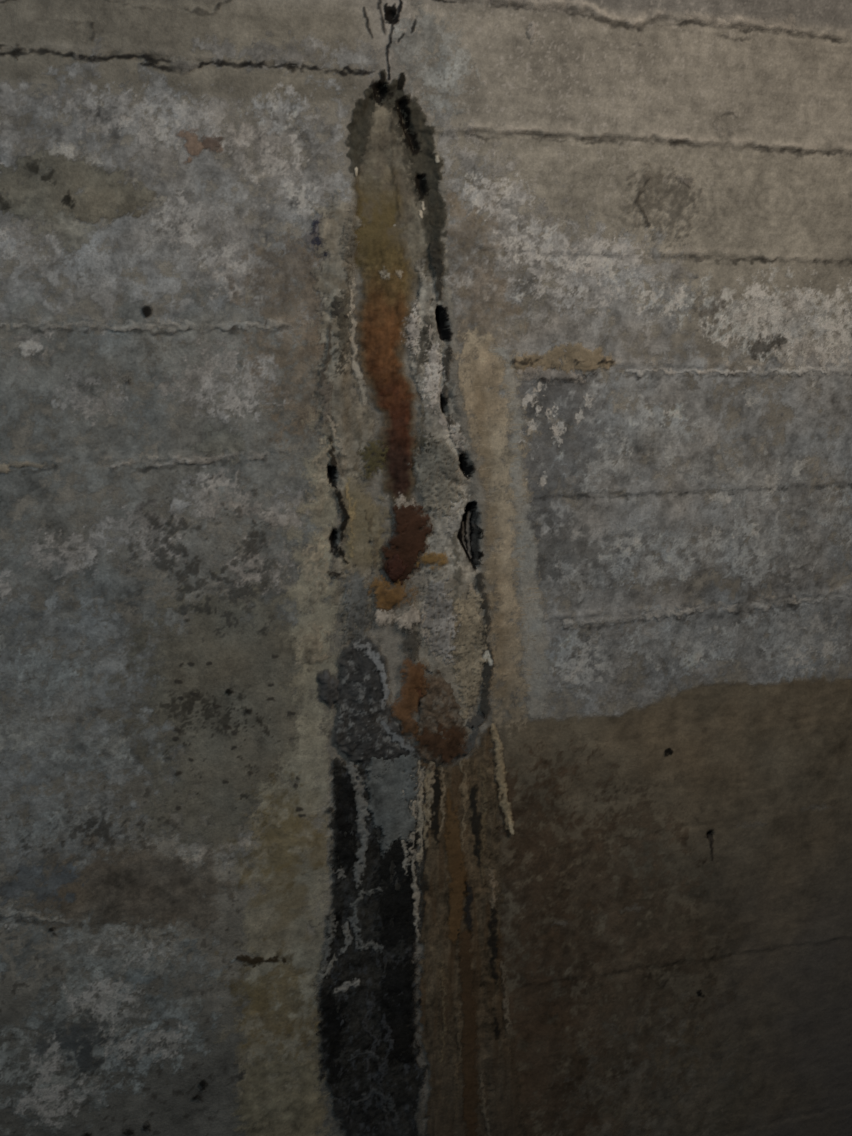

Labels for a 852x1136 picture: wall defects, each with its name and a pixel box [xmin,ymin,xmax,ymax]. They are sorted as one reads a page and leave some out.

crack [0,0,416,80]
spalling [346,69,447,290]
damp [390,9,470,192]
rust [356,241,448,630]
rust [389,658,429,741]